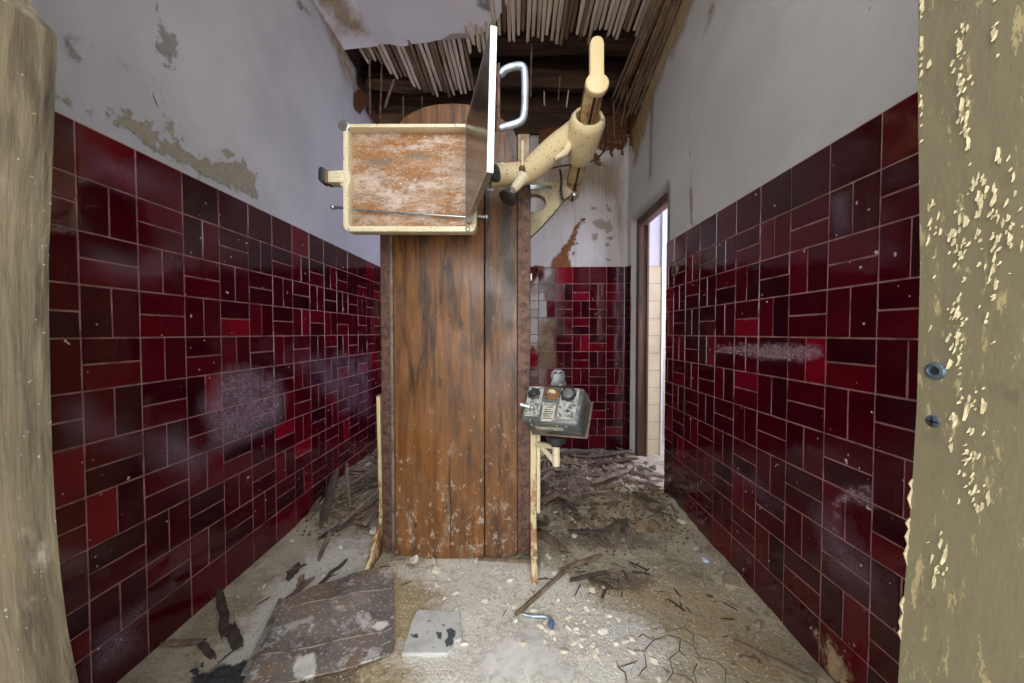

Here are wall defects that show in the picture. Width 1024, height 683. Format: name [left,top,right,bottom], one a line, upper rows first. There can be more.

peeling [156,25,178,67]
peeling [918,36,932,78]
peeling [106,106,258,199]
spalling [353,88,380,124]
spalling [537,127,558,144]
spalling [593,85,649,167]
peeling [950,23,974,151]
peeling [926,147,1023,513]
crack [616,625,727,683]